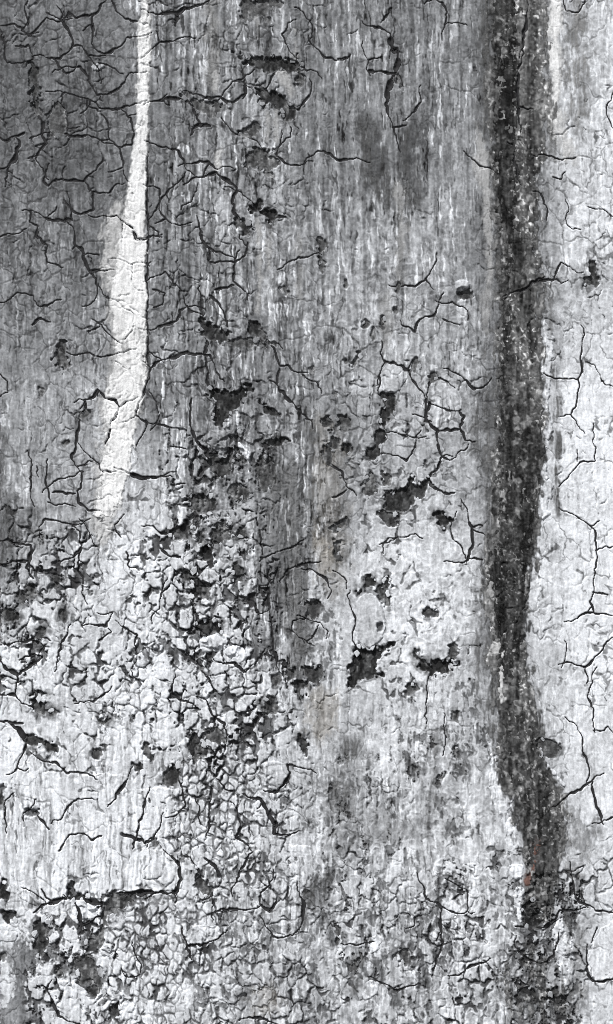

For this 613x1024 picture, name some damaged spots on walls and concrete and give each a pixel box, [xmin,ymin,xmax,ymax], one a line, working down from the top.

crack [0,0,423,960]
spalling [168,437,291,600]
peeling [347,574,396,691]
spalling [360,392,434,527]
spalling [403,642,462,696]
crack [377,253,492,564]
damp [471,0,590,924]
crack [543,325,613,825]
peeling [0,722,227,1024]
crack [368,873,491,992]
damp [493,941,570,1019]
crack [514,861,613,983]